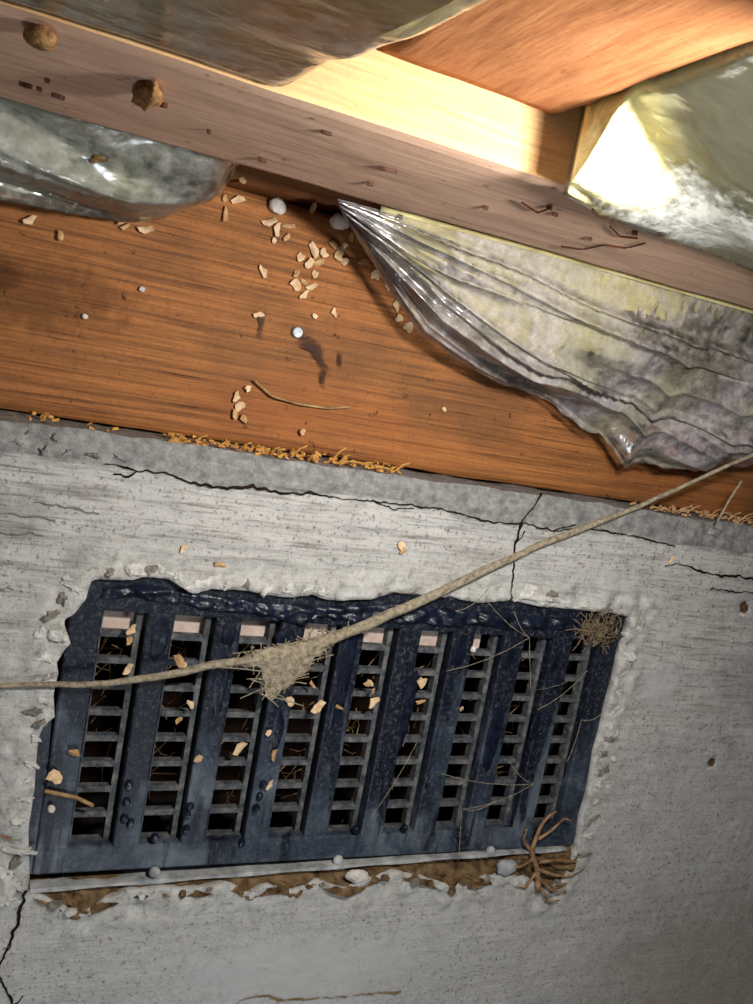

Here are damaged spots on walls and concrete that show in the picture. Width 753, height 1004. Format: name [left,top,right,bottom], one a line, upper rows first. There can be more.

crack [105,463,753,602]
crack [0,890,27,1004]